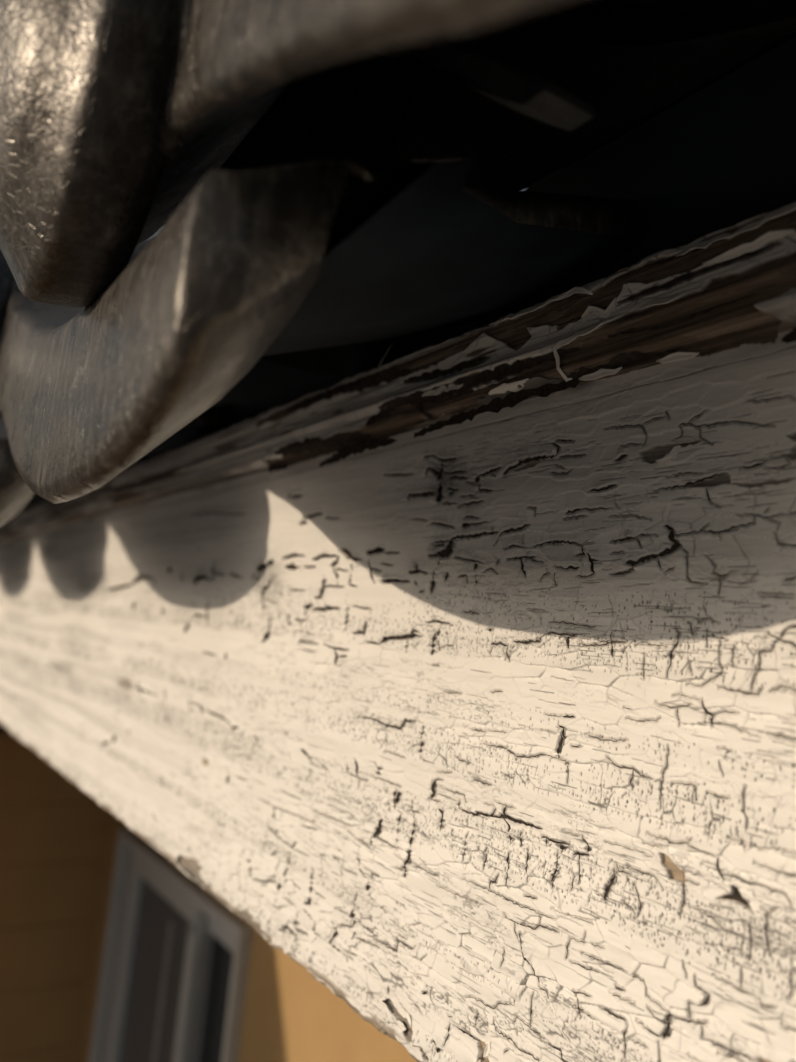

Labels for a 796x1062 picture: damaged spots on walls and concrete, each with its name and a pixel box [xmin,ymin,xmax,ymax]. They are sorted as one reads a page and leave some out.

crack [617,230,781,304]
peeling [257,204,796,473]
peeling [691,475,793,487]
peeling [282,560,302,572]
peeling [343,549,363,567]
crack [108,293,796,1062]